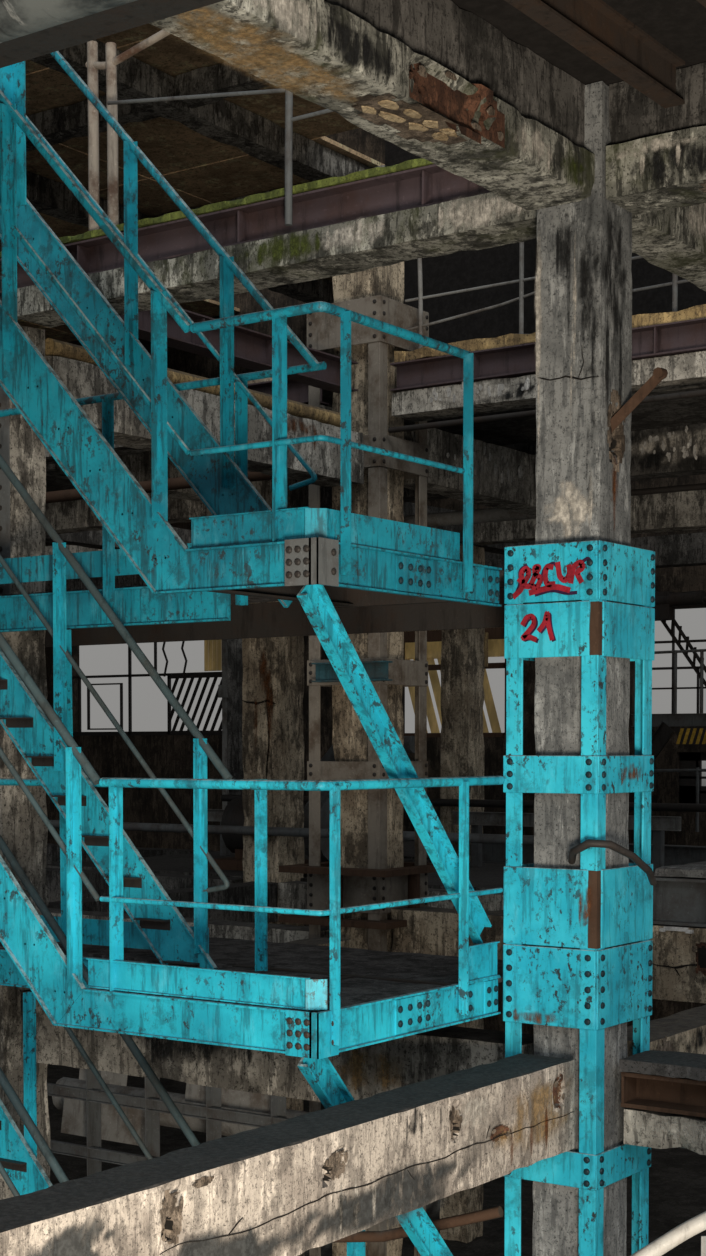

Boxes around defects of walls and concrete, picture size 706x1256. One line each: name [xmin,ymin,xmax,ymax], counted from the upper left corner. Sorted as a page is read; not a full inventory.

water stain [315,221,382,250]
water stain [498,258,541,400]
water stain [556,209,626,405]
crack [652,963,697,976]
spalling [691,942,706,976]
spalling [160,1176,214,1245]
spalling [322,1149,348,1181]
crack [160,1111,574,1255]